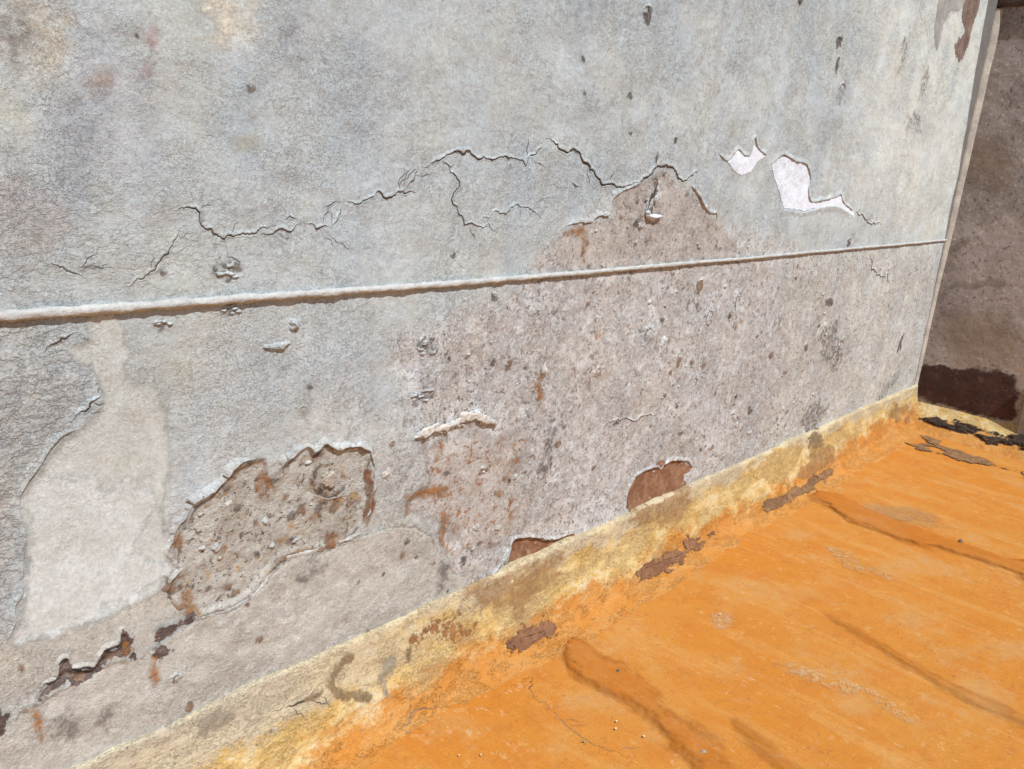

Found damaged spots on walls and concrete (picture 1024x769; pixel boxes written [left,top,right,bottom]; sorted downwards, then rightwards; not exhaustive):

peeling [935,0,980,61]
crack [47,137,700,288]
peeling [719,134,855,221]
peeling [798,286,834,374]
peeling [661,352,706,399]
peeling [2,314,380,700]
spalling [403,409,575,592]
spalling [625,431,714,512]
corrosion [409,609,477,650]